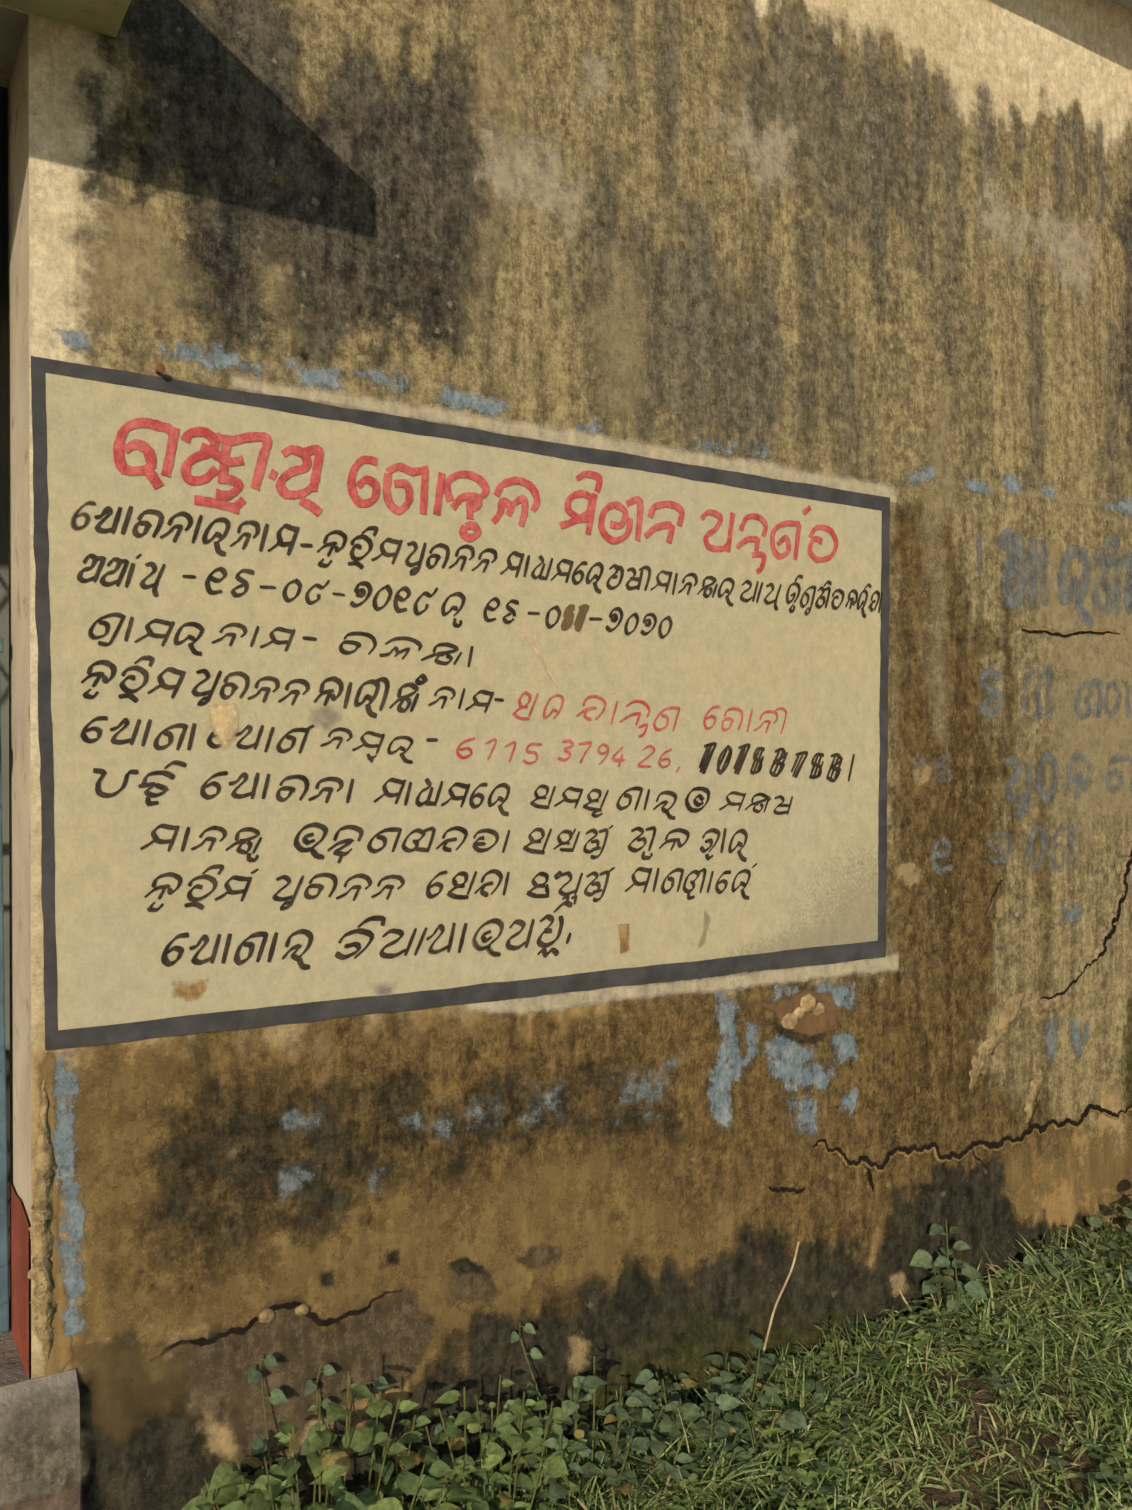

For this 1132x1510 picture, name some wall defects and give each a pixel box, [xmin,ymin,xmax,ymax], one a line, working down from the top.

leakage [75,0,1132,1178]
crack [1022,627,1121,638]
crack [1040,842,1132,1000]
peeling [707,978,859,1136]
crack [768,1186,806,1194]
crack [813,1101,1132,1192]
spalling [450,1258,496,1303]
spalling [518,1246,561,1269]
leakage [0,1151,1101,1510]